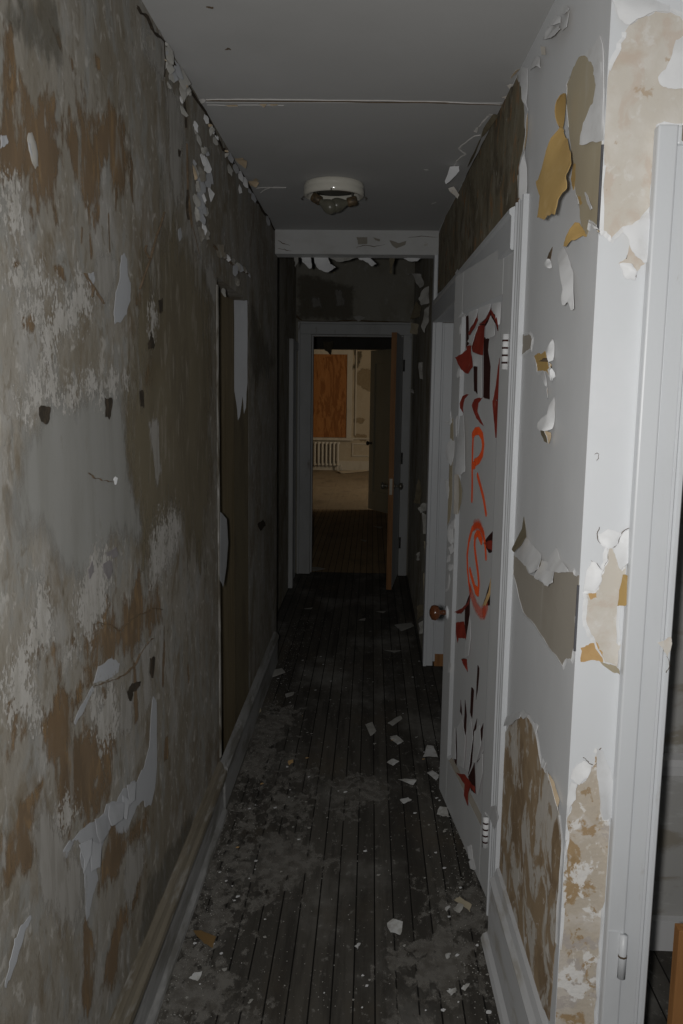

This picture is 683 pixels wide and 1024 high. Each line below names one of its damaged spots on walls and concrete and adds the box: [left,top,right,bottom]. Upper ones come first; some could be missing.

peeling [165,42,259,297]
peeling [404,0,683,334]
peeling [294,257,376,272]
peeling [546,338,555,380]
peeling [537,398,555,444]
peeling [512,518,629,674]
leakage [83,672,121,762]
leakage [50,784,84,838]
peeling [63,782,136,874]
peeling [489,710,613,1024]